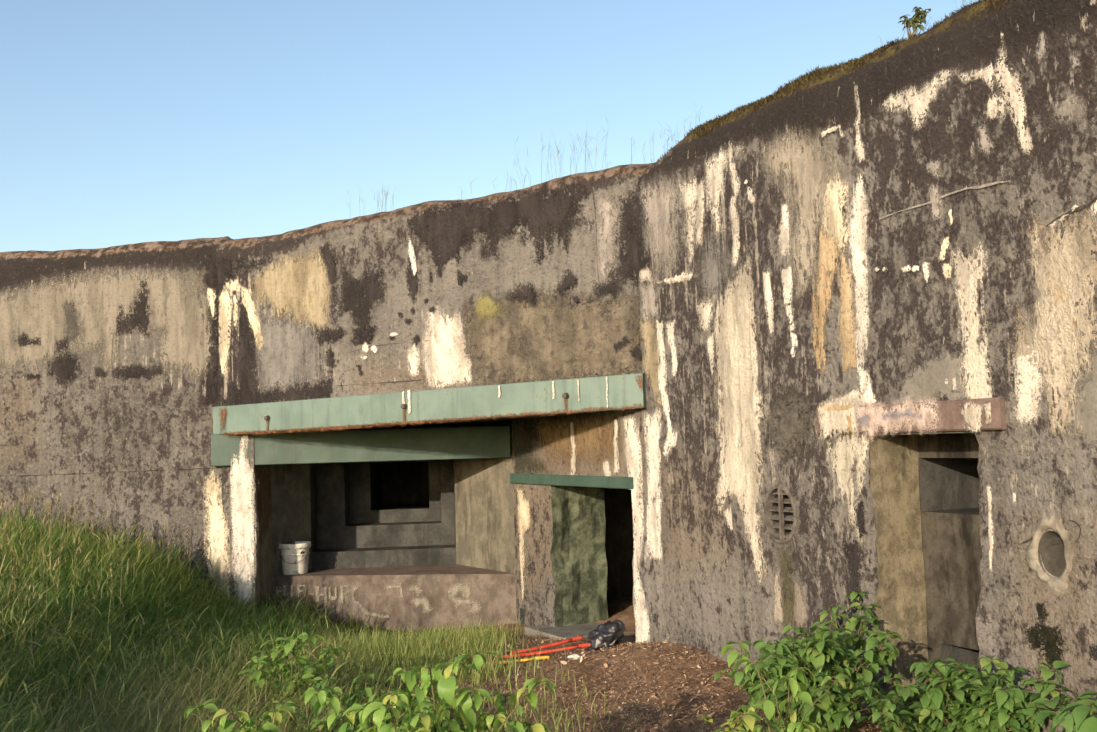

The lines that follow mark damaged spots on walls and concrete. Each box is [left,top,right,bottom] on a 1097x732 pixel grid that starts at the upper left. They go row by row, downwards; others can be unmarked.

crack [879,181,1009,219]
leakage [398,179,591,346]
leakage [593,184,651,299]
leakage [14,332,41,347]
leakage [24,302,82,387]
leakage [95,363,166,381]
leakage [115,280,152,337]
leakage [204,240,387,406]
leakage [613,335,641,360]
rust [219,399,643,464]